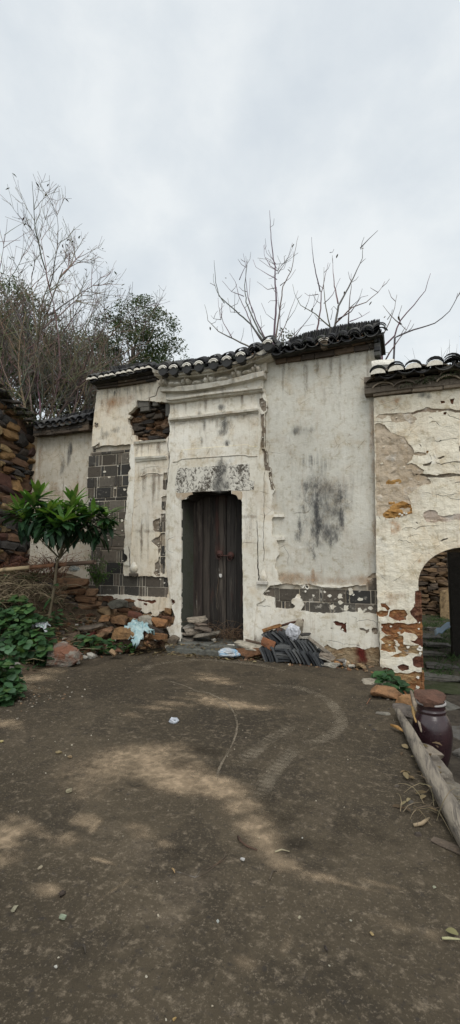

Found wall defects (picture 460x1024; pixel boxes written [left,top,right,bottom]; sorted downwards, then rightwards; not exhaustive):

peeling [86,401,193,647]
leakage [299,488,343,540]
peeling [374,399,460,524]
crack [411,414,460,500]
peeling [264,573,425,694]